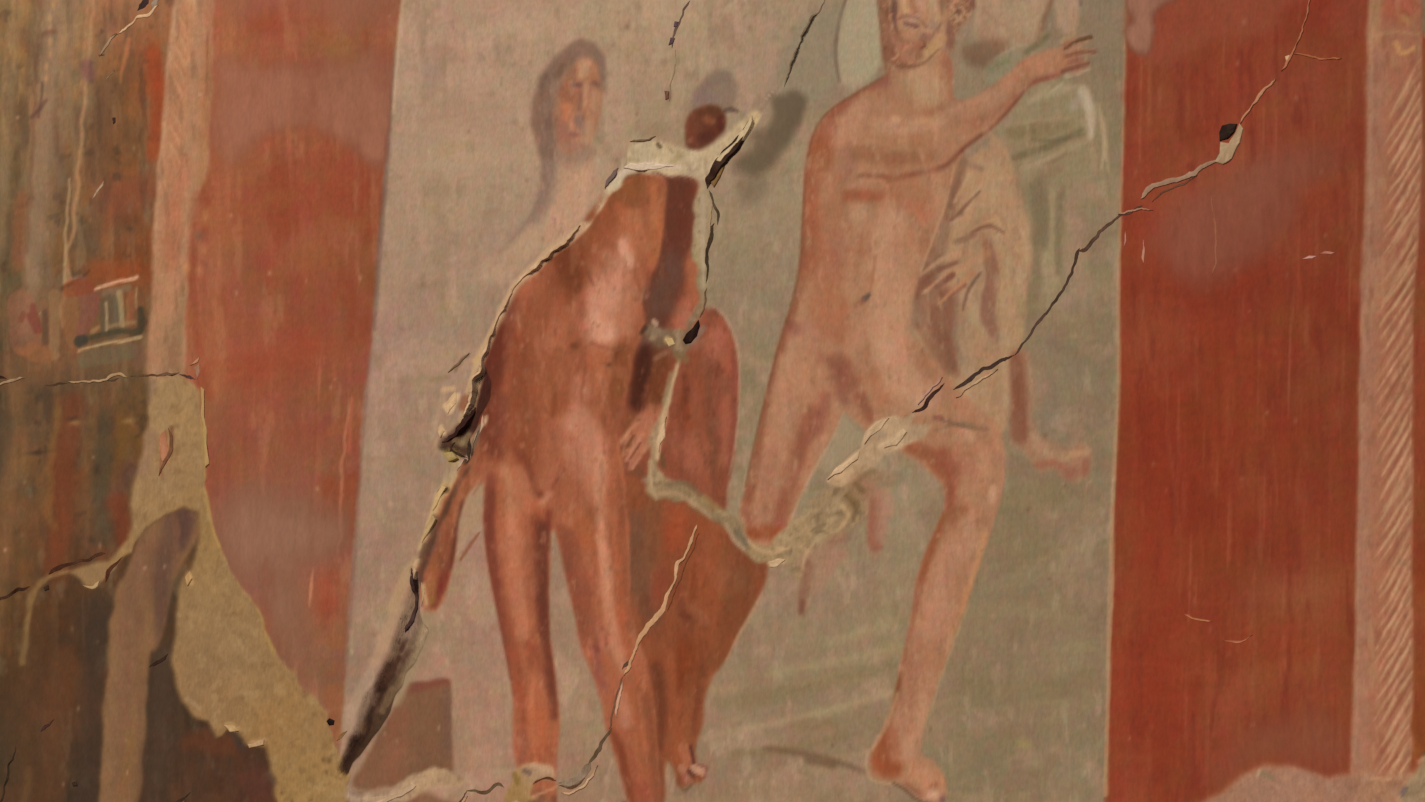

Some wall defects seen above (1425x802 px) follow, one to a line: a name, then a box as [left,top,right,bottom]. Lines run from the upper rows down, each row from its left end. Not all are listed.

crack [99,0,159,81]
crack [664,1,690,101]
crack [784,0,825,87]
crack [683,122,748,344]
crack [912,0,1341,413]
crack [0,356,200,386]
flaking render [585,108,932,581]
flaking render [19,374,465,802]
crack [341,225,581,772]
crack [459,524,699,802]
flaking render [1204,757,1425,802]